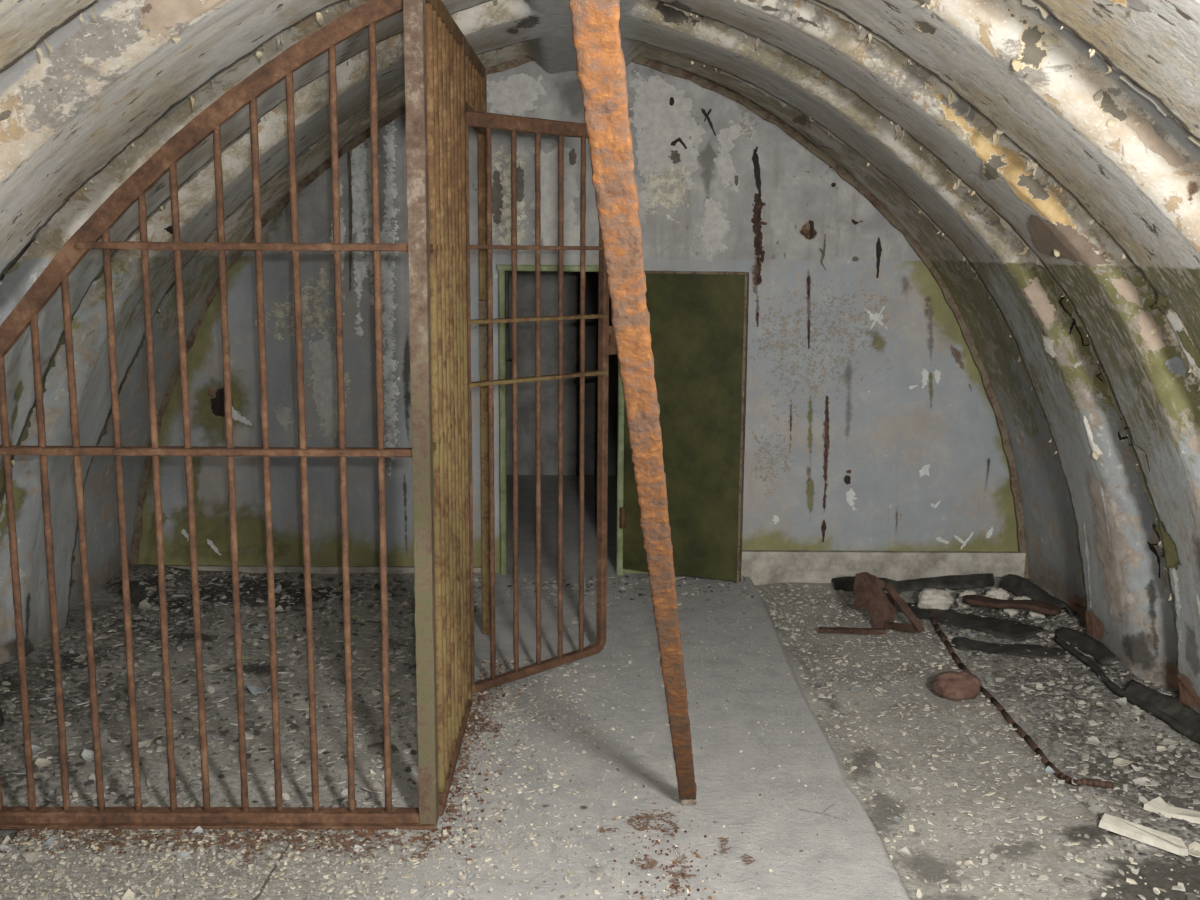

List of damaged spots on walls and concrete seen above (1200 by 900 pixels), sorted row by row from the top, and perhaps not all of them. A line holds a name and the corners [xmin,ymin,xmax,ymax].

peeling [138,0,226,44]
peeling [913,0,938,36]
peeling [1004,0,1063,72]
peeling [1105,0,1152,19]
peeling [163,28,291,118]
peeling [0,109,12,122]
peeling [1094,65,1186,168]
peeling [89,116,267,295]
peeling [11,318,74,467]